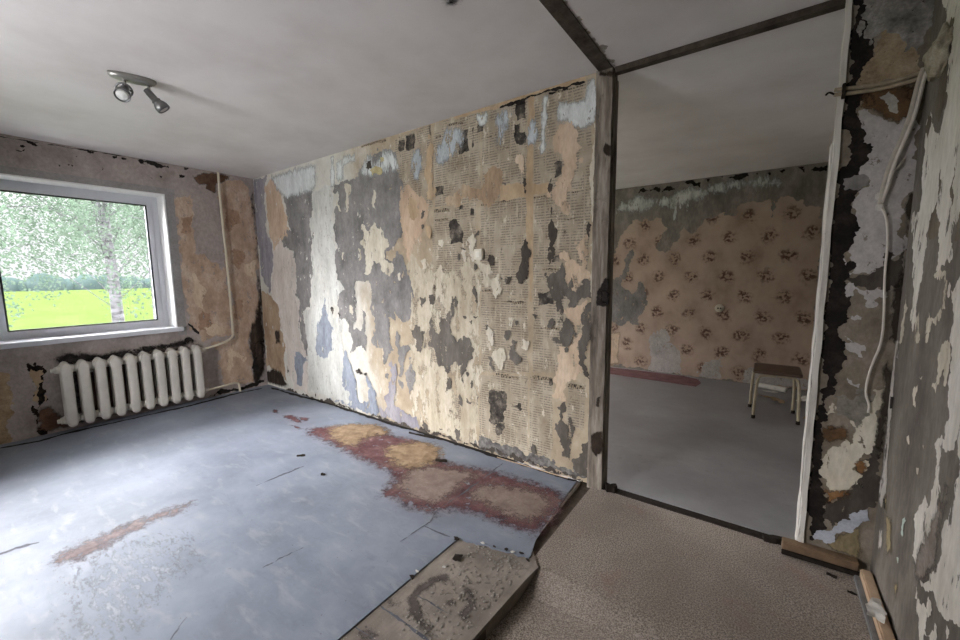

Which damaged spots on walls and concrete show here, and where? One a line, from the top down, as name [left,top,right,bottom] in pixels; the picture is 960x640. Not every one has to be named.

spalling [852,0,935,101]
flaking render [925,66,948,138]
peeling [138,159,169,178]
peeling [638,169,786,193]
flaking render [843,167,869,191]
flaking render [843,249,907,321]
flaking render [899,167,960,344]
flaking render [231,148,591,534]
spalling [26,362,48,435]
flaking render [823,378,885,528]
peeling [919,473,939,525]
peeling [914,584,949,640]